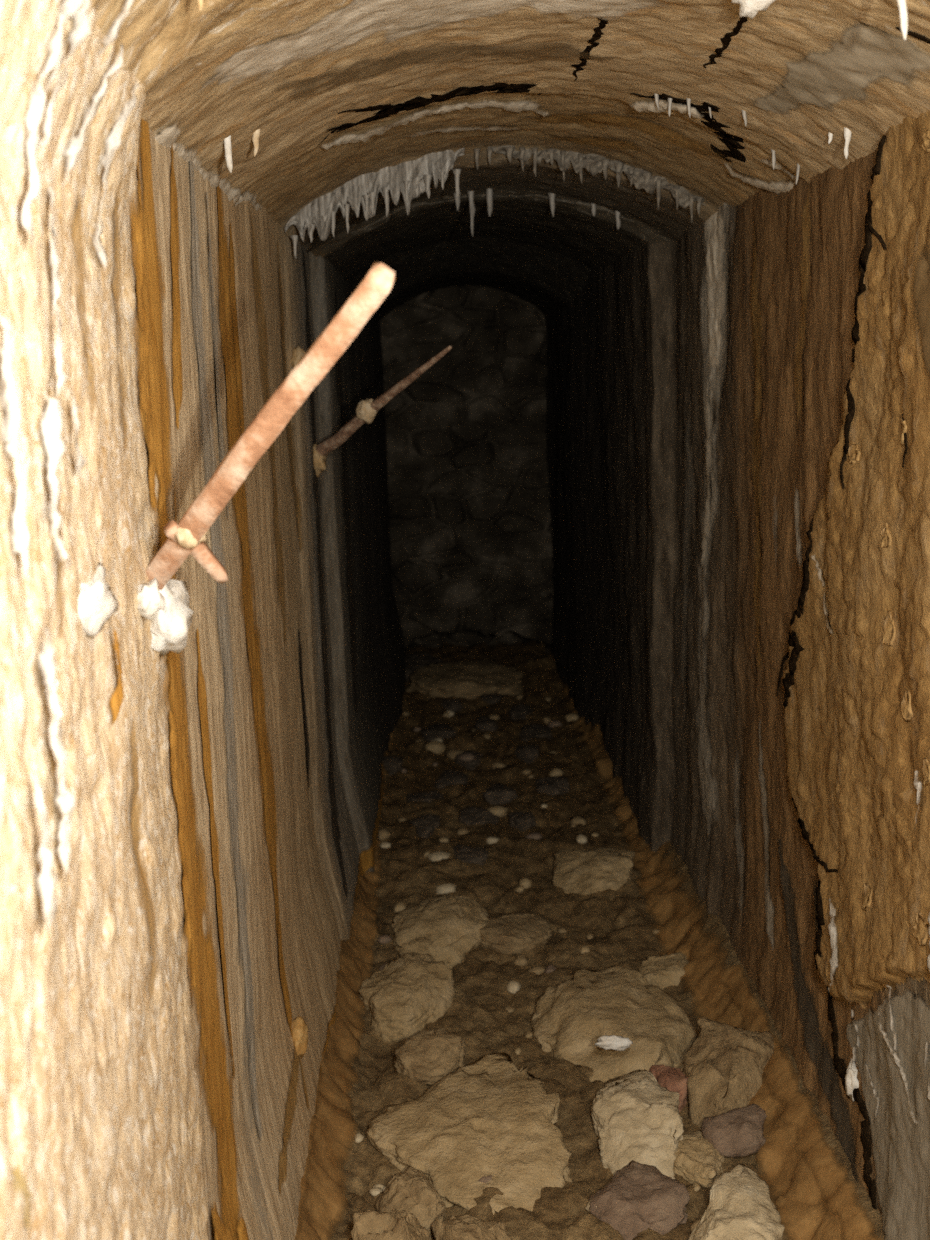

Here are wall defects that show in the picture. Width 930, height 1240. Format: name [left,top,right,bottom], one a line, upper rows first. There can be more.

crack [321,83,541,142]
crack [571,5,609,81]
crack [630,93,746,162]
crack [703,17,748,68]
rust [73,184,96,418]
crack [826,134,887,491]
water stain [78,562,119,637]
rust [113,117,396,1240]
crack [776,519,813,707]
flaking render [784,111,930,1240]
crack [786,781,877,1210]